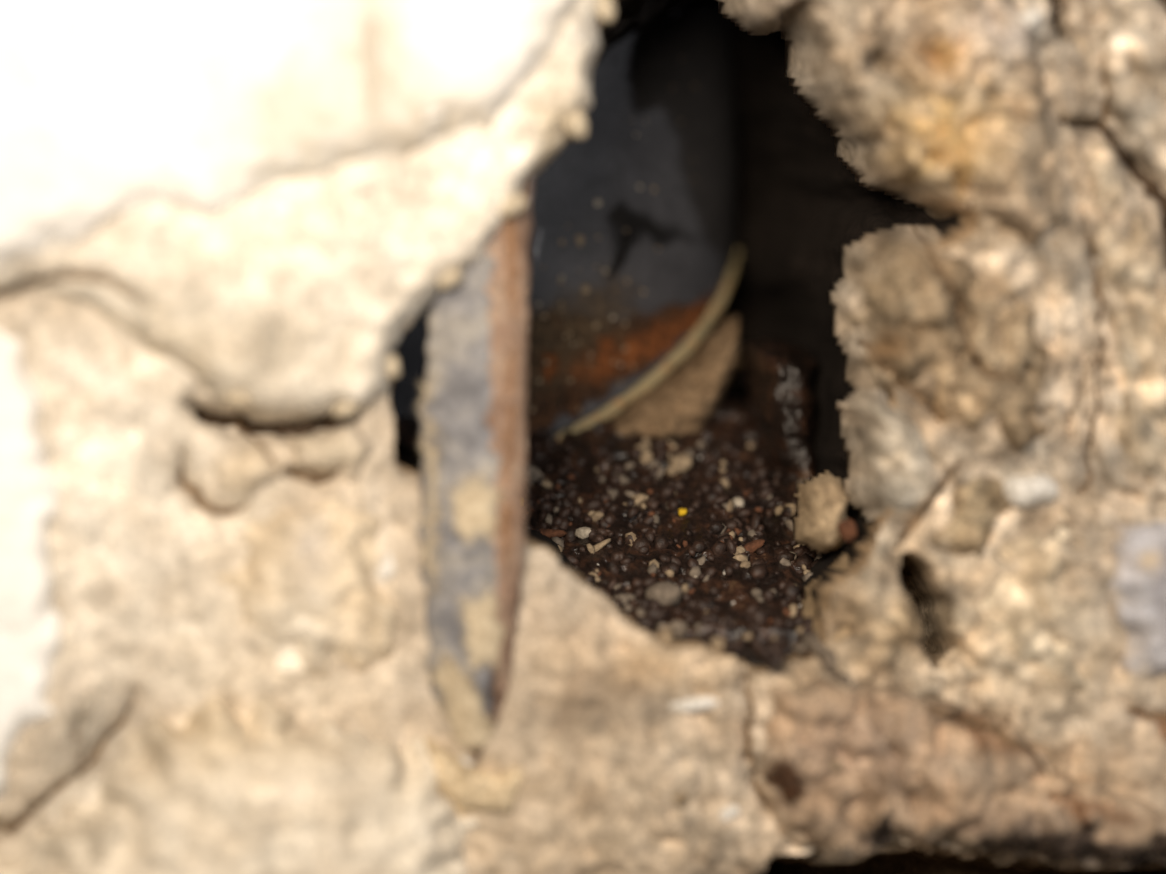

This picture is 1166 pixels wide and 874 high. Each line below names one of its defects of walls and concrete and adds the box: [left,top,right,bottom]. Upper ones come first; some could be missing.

peeling [0,0,582,267]
spalling [386,346,423,478]
corrosion [483,175,722,727]
spalling [593,0,698,68]
spalling [668,0,1069,642]
crack [1050,0,1062,33]
crack [1067,207,1107,498]
crack [1061,31,1166,246]
spalling [1063,0,1166,482]
spalling [217,498,398,679]
spalling [525,528,813,673]
spalling [931,476,1092,694]